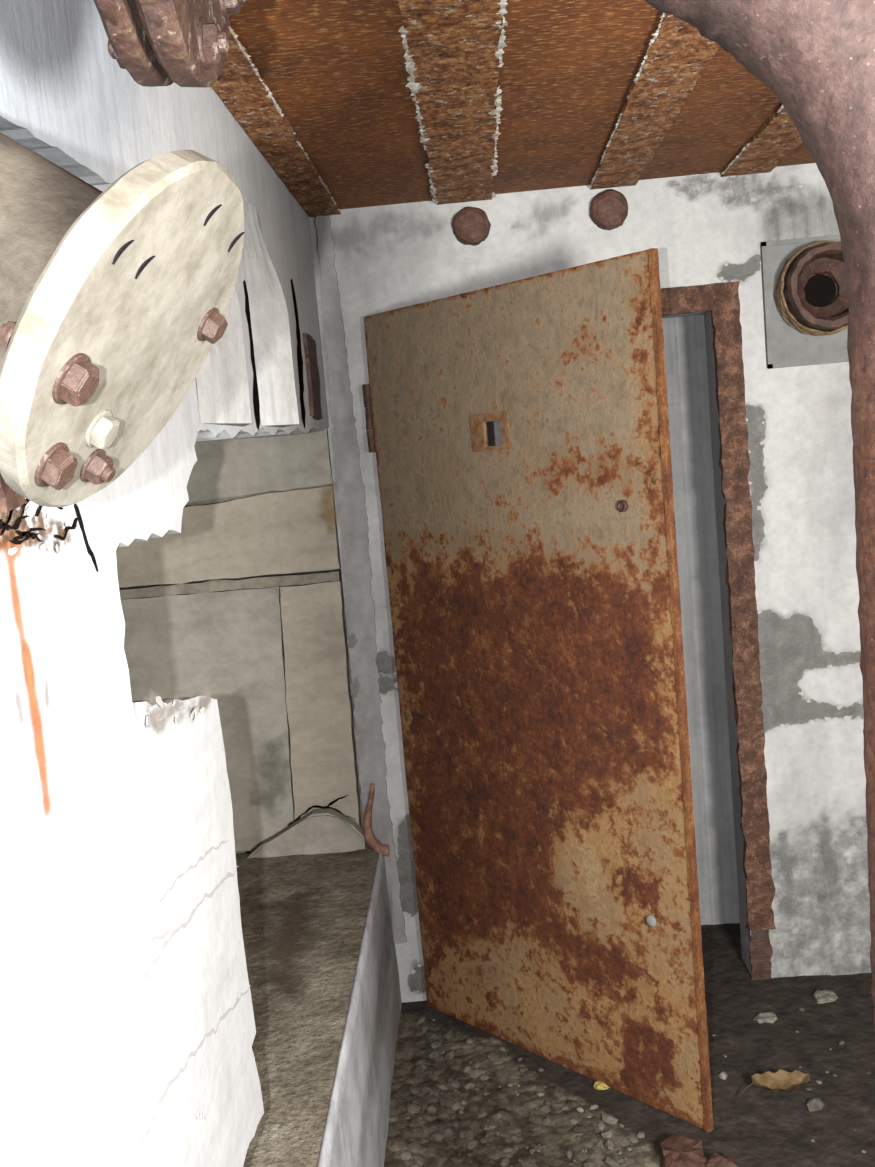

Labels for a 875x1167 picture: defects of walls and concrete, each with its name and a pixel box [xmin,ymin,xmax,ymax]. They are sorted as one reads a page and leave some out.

water stain [495,0,508,68]
water stain [627,13,665,99]
water stain [398,26,438,203]
water stain [488,86,503,176]
water stain [589,113,622,188]
crack [0,509,14,536]
peeling [0,498,78,556]
crack [74,504,99,572]
corrosion [0,524,50,814]
spalling [146,695,211,732]
crack [288,795,356,826]
water stain [769,817,871,978]